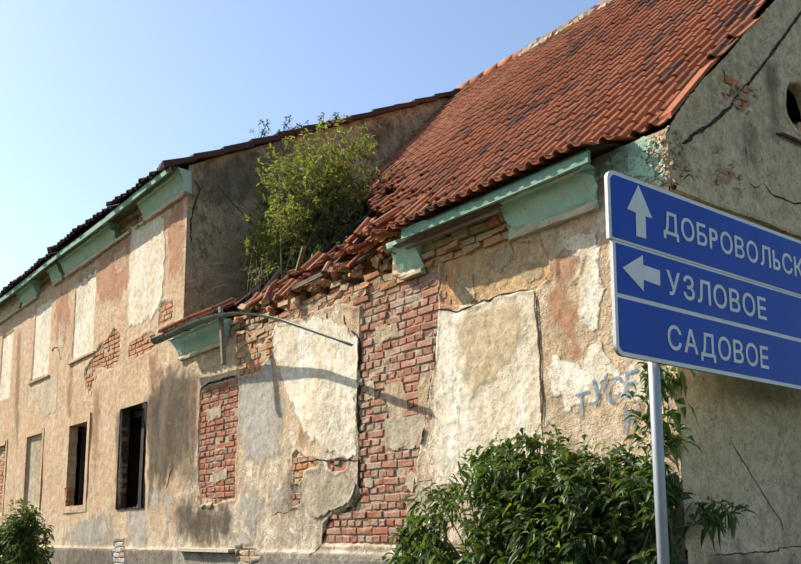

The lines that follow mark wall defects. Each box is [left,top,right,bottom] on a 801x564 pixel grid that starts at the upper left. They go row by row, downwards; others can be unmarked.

crack [682,12,801,144]
spalling [723,74,760,116]
peeling [594,125,692,187]
crack [168,179,252,241]
crack [750,183,801,204]
peeling [54,293,69,351]
peeling [79,202,186,394]
crack [437,236,549,422]
peeling [33,375,58,418]
peeling [196,229,647,562]
crack [716,438,801,556]